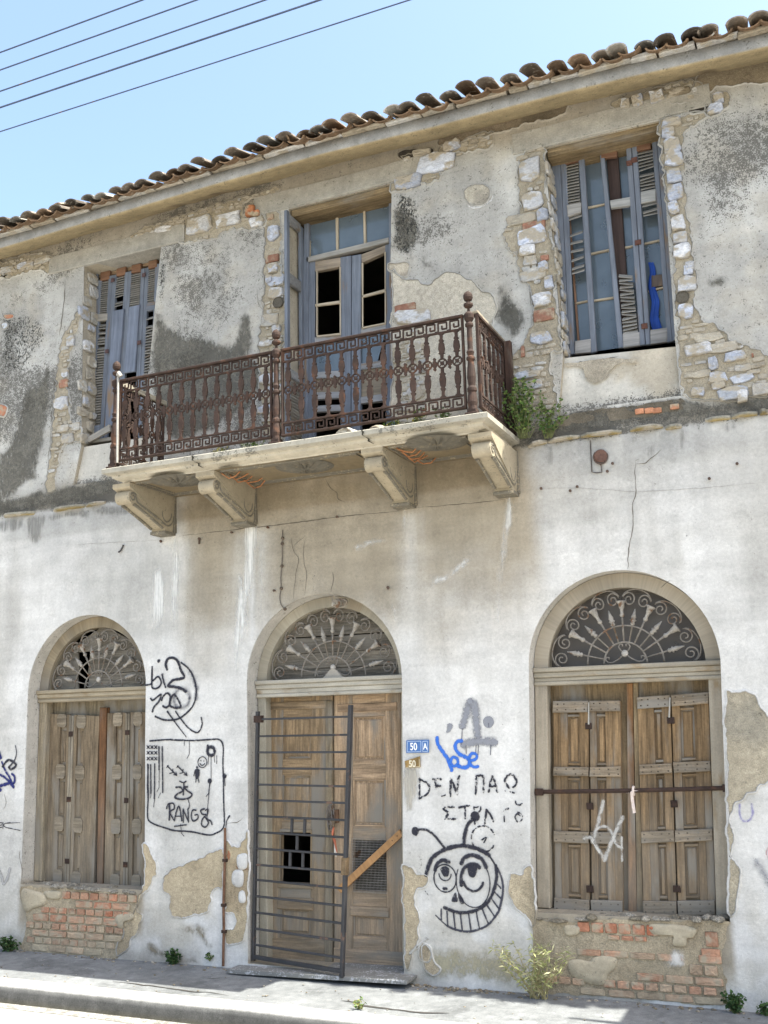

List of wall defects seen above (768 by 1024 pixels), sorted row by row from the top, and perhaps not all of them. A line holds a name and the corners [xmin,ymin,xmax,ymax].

leakage [395,211,416,249]
spalling [516,62,768,426]
spalling [387,261,503,423]
leakage [0,371,127,541]
crack [585,455,763,566]
flaking render [20,830,251,959]
flaking render [507,689,768,1006]